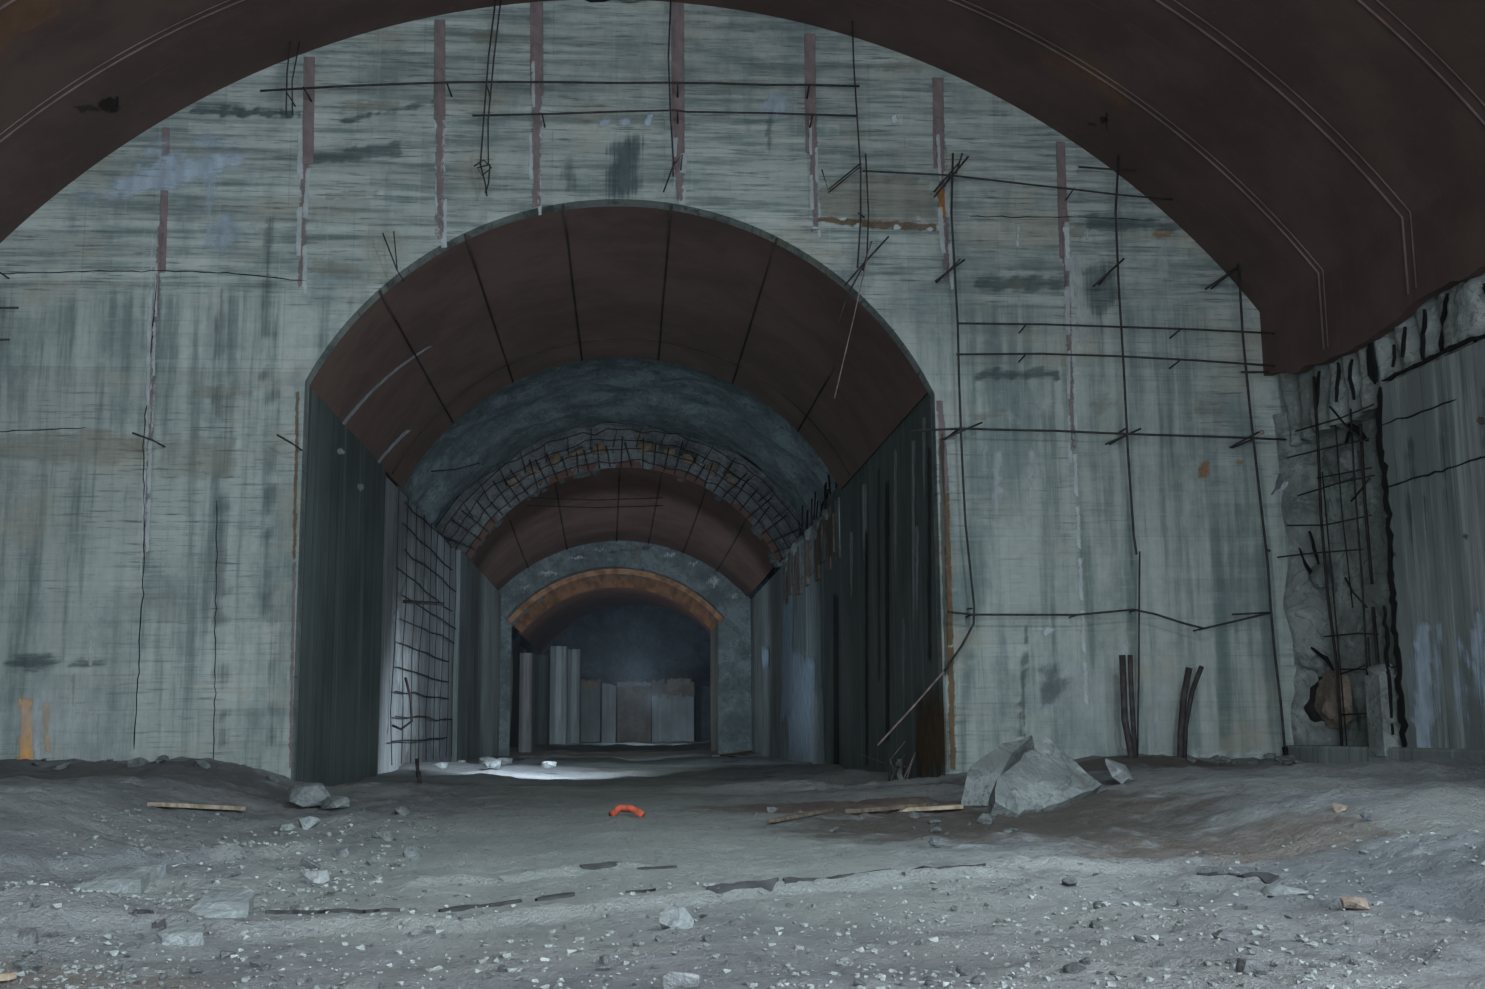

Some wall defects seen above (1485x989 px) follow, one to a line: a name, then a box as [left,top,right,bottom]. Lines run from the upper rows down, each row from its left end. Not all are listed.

spalling [1271,473,1288,495]
spalling [1323,440,1358,483]
spalling [390,428,841,765]
water stain [1409,611,1485,748]